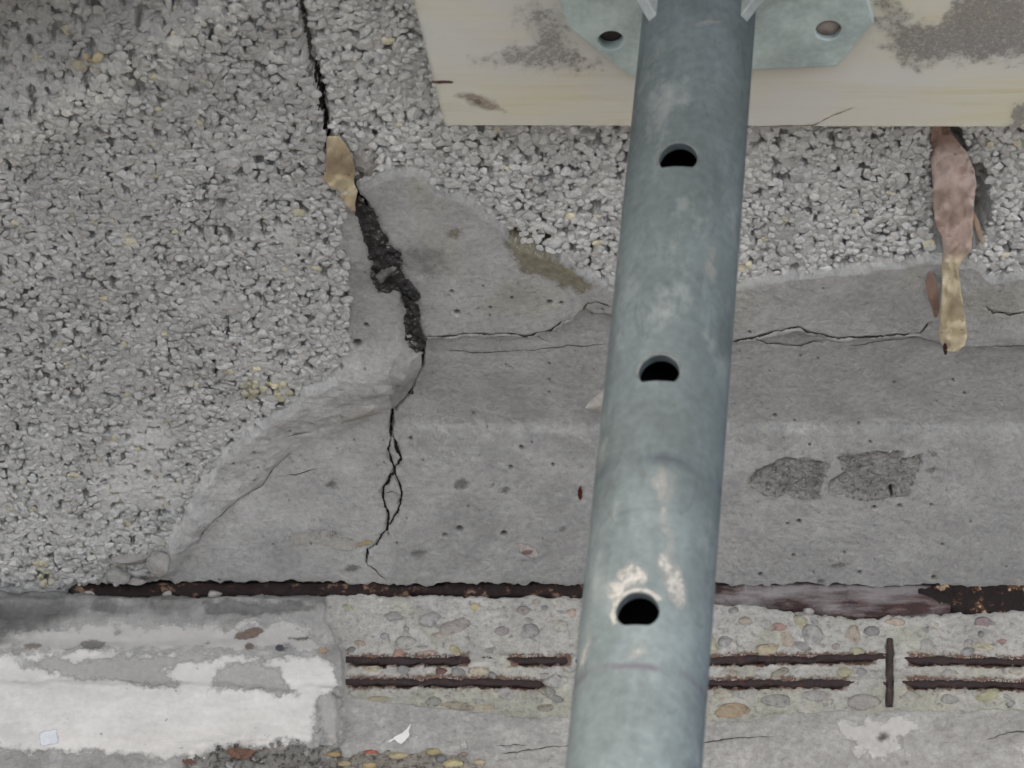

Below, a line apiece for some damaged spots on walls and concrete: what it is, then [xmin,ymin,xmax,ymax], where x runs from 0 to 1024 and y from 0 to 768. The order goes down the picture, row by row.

crack [299,0,331,148]
crack [733,324,932,346]
crack [365,289,612,580]
corrosion [71,581,583,599]
corrosion [714,582,1024,620]
damp [81,631,120,649]
damp [202,598,314,649]
spalling [346,656,544,689]
corrosion [347,652,572,691]
spalling [708,678,854,689]
spalling [710,653,1024,666]
spalling [883,679,1024,690]